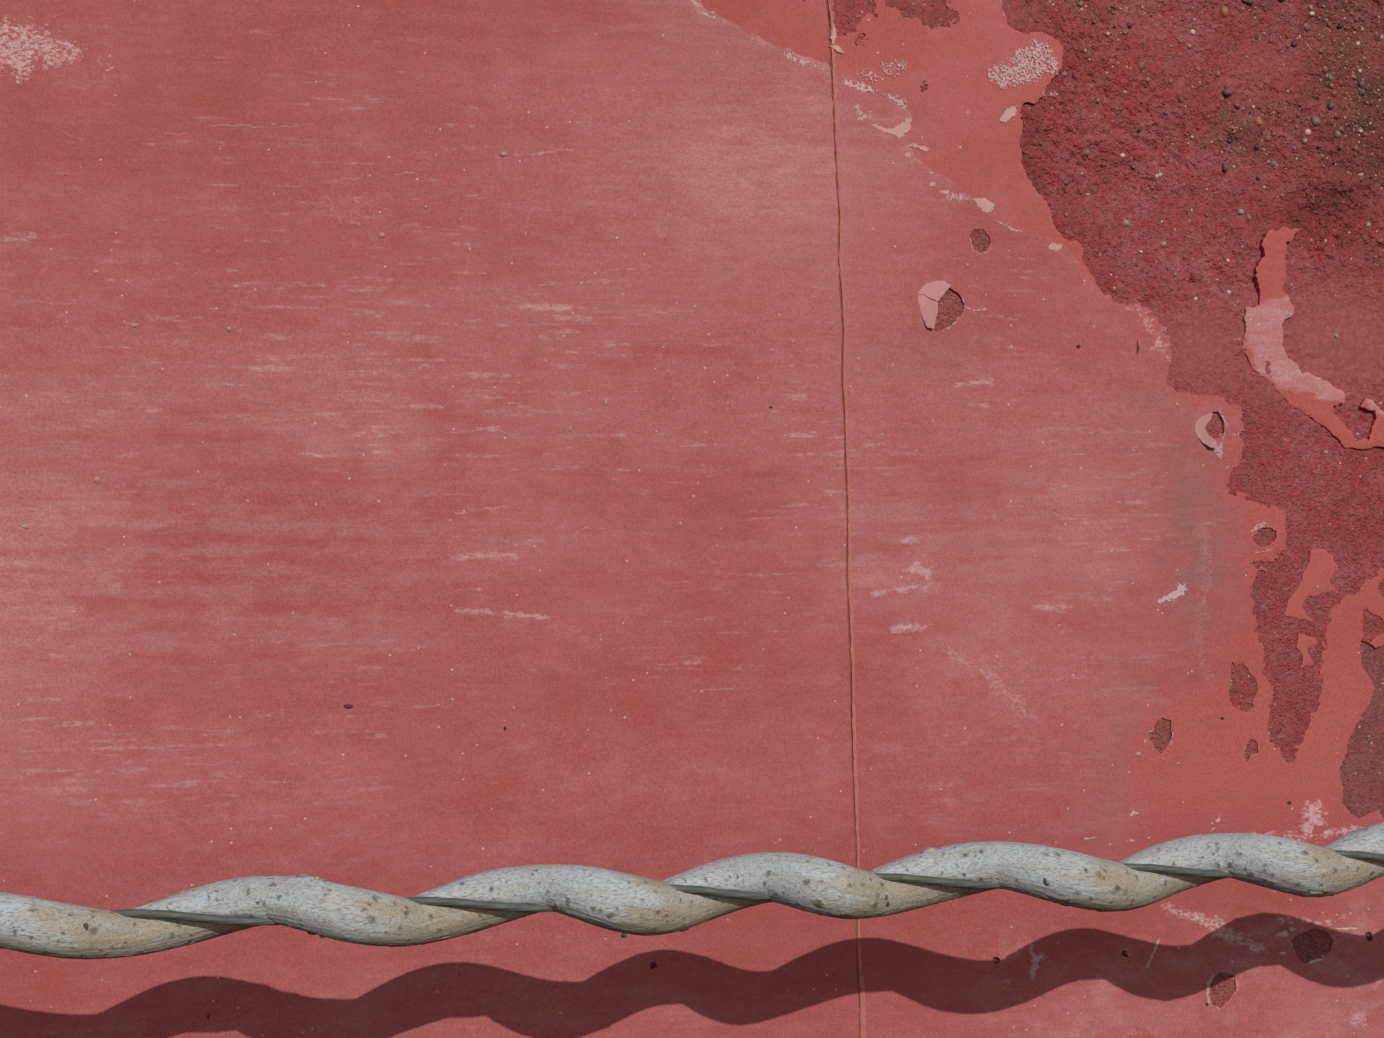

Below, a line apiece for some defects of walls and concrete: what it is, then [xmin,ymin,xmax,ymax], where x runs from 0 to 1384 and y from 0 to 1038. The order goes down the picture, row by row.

crack [828,9,860,869]
spalling [688,0,1384,763]
spalling [1339,609,1384,818]
crack [855,919,866,1038]
peeling [1205,971,1238,1010]
peeling [1276,927,1333,965]